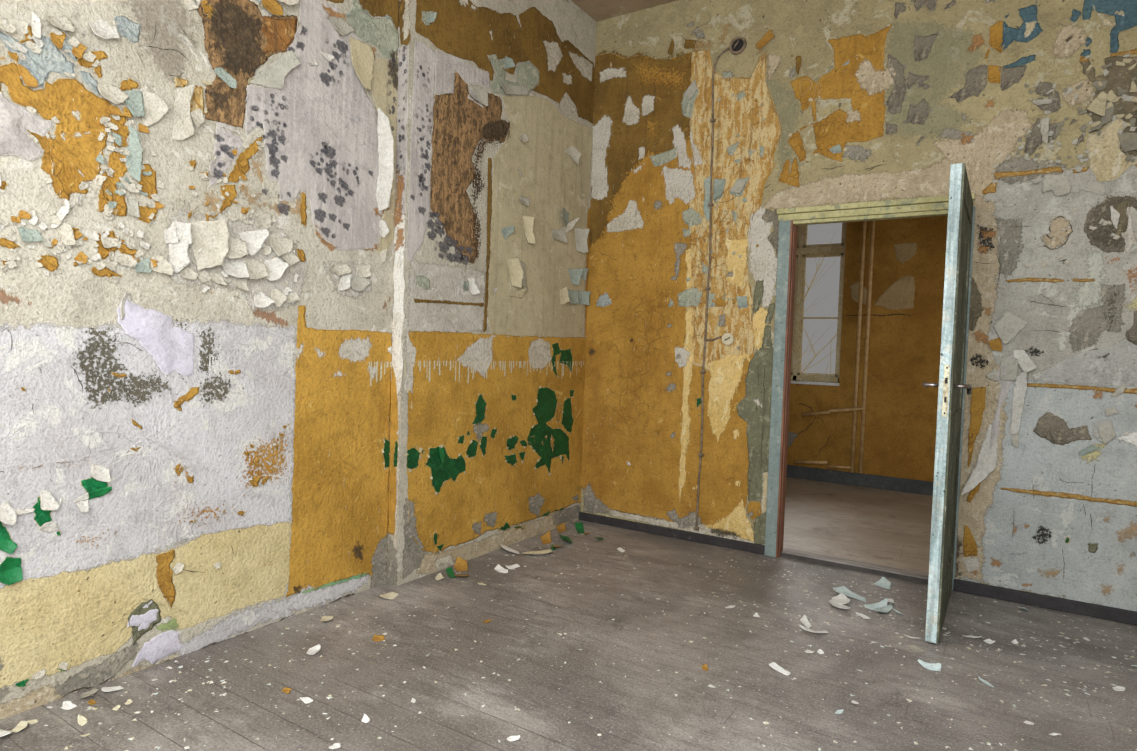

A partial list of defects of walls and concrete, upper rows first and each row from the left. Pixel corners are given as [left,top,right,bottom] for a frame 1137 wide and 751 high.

peeling [183,0,217,18]
peeling [257,0,299,54]
peeling [345,0,1137,582]
peeling [0,11,398,720]
peeling [874,577,891,589]
peeling [11,719,38,733]
peeling [77,714,91,737]